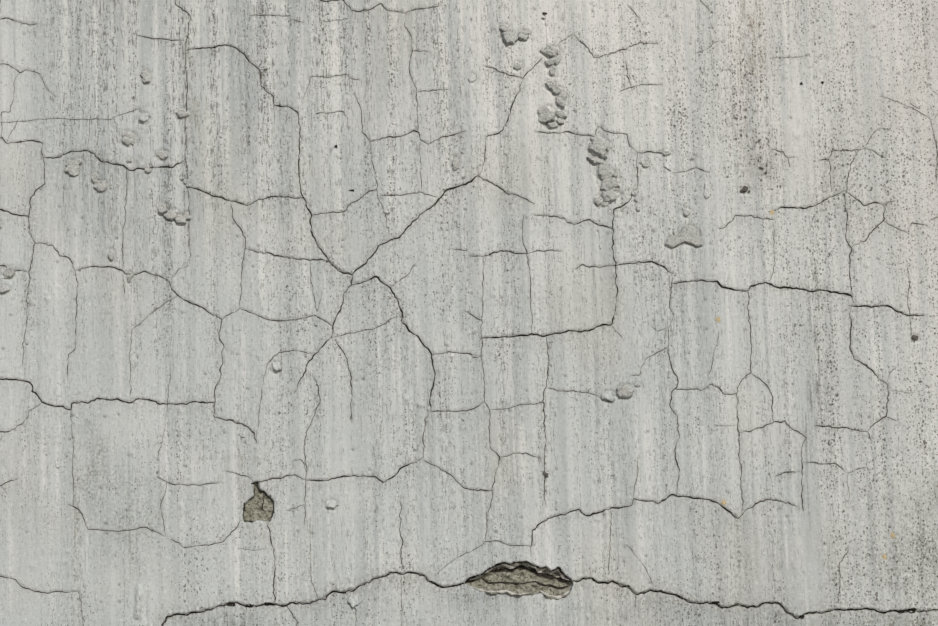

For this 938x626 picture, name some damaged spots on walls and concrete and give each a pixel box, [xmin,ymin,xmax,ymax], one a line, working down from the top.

crack [881,84,938,186]
crack [0,0,671,521]
crack [161,128,938,626]
crack [70,420,239,548]
spalling [243,481,274,523]
crack [0,576,84,626]
spalling [466,561,573,599]